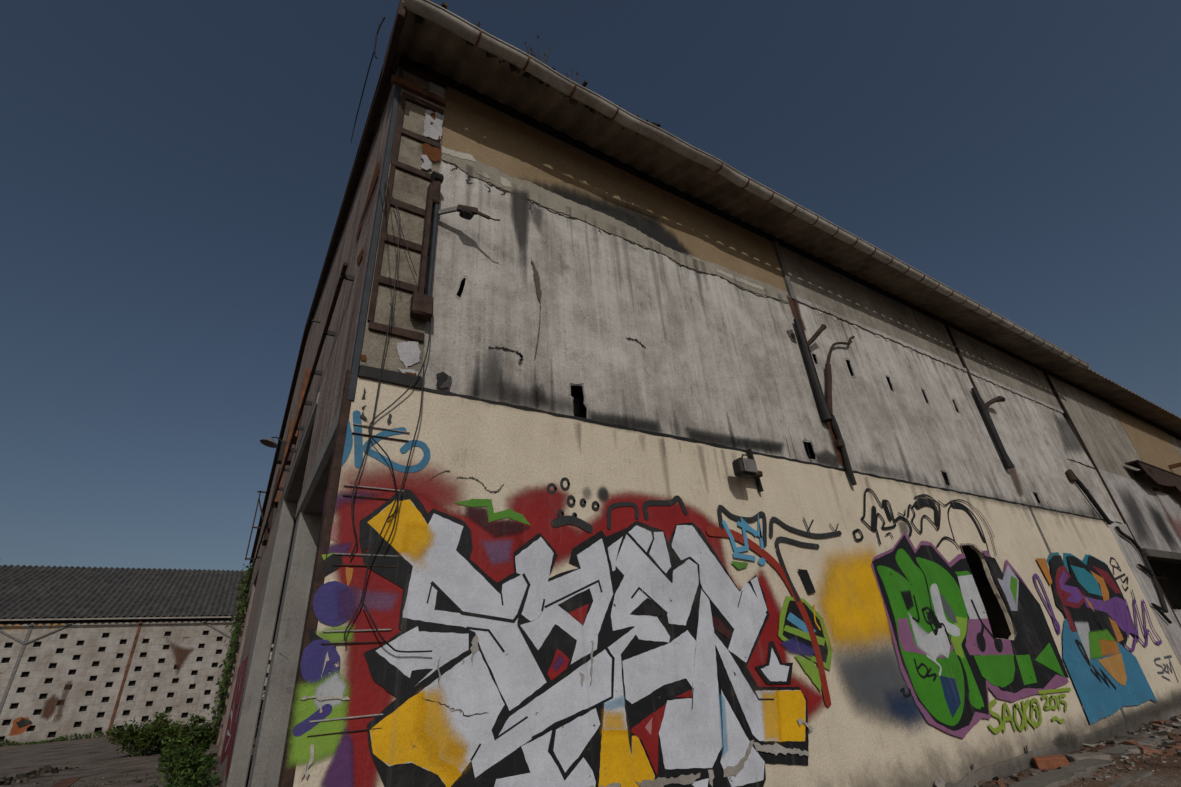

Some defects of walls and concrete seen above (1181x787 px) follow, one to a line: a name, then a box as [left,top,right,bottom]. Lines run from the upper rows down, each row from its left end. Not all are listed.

damp [511,181,688,255]
spalling [421,109,789,303]
crack [442,160,788,304]
rust [787,296,806,330]
peeling [397,341,421,375]
damp [590,412,658,431]
damp [689,429,782,452]
damp [817,452,838,468]
rust [827,422,844,464]
damp [1125,498,1176,546]